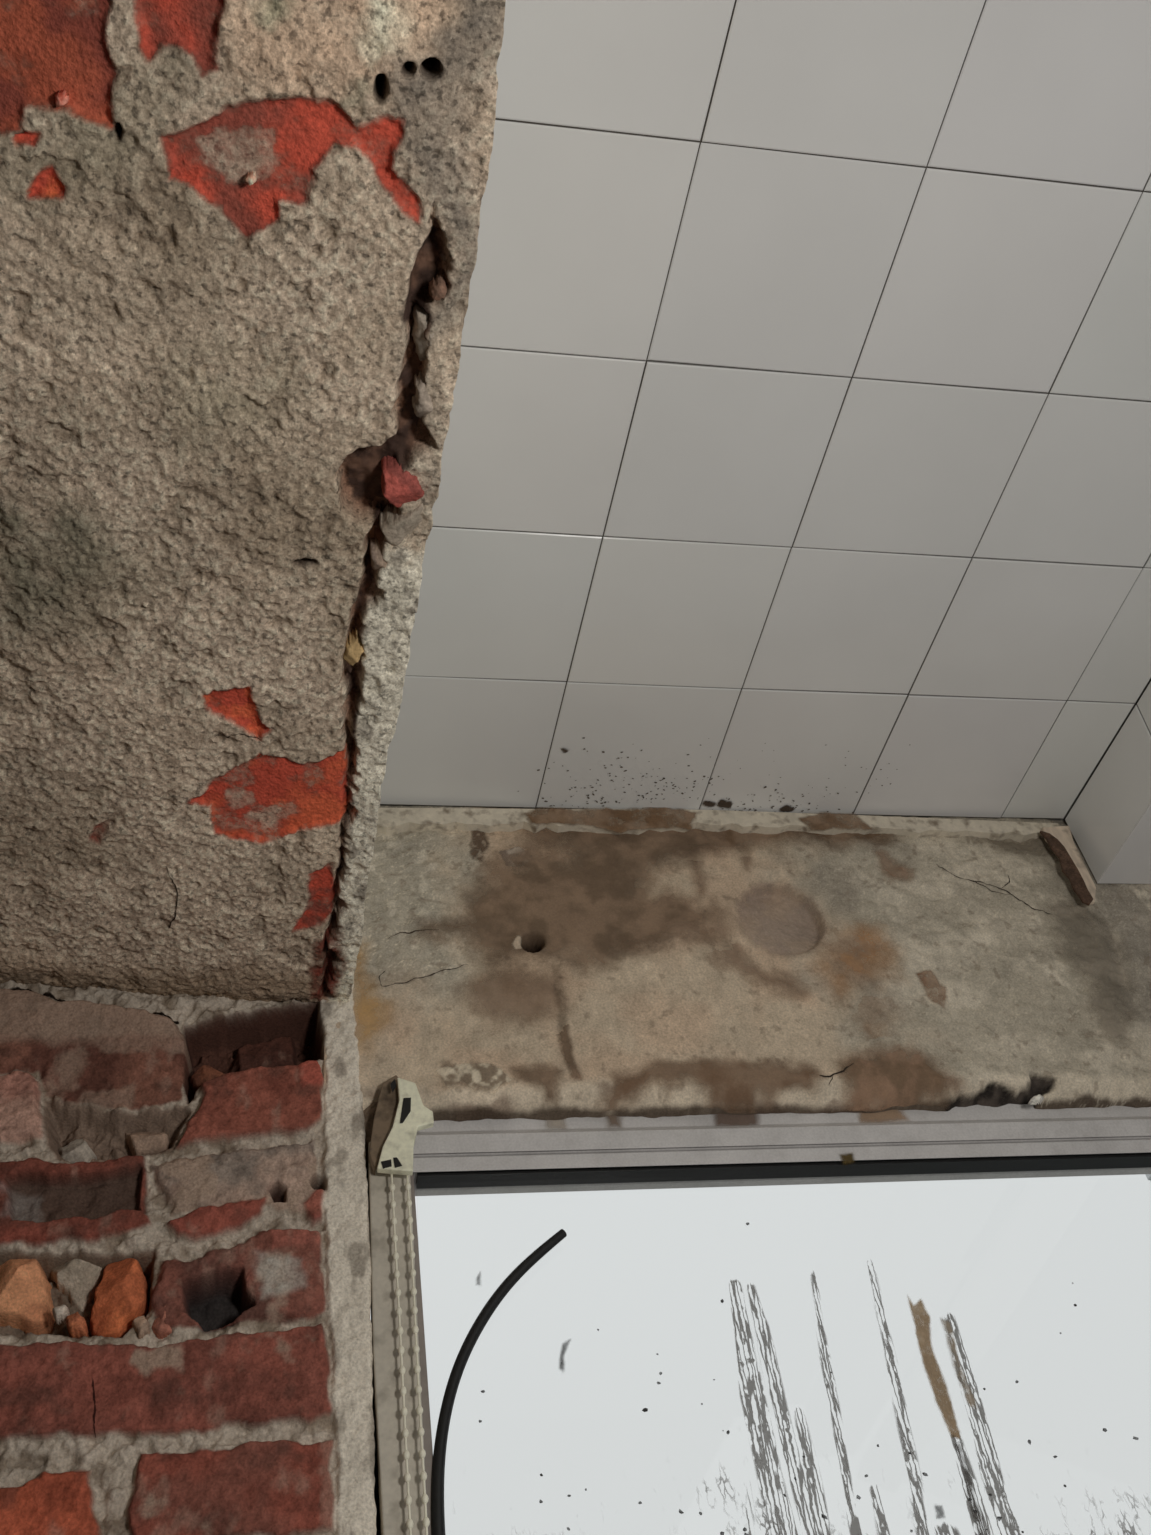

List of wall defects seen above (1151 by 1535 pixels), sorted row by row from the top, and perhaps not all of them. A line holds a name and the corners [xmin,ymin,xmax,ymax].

spalling [0,0,117,145]
spalling [135,0,223,76]
spalling [162,98,420,237]
crack [345,226,449,752]
spalling [189,687,347,843]
spalling [293,864,346,999]
crack [329,812,347,922]
leakage [423,737,910,1020]
leakage [607,1060,816,1126]
leakage [729,1280,831,1535]
leakage [811,1272,890,1535]
leakage [867,1261,1021,1535]